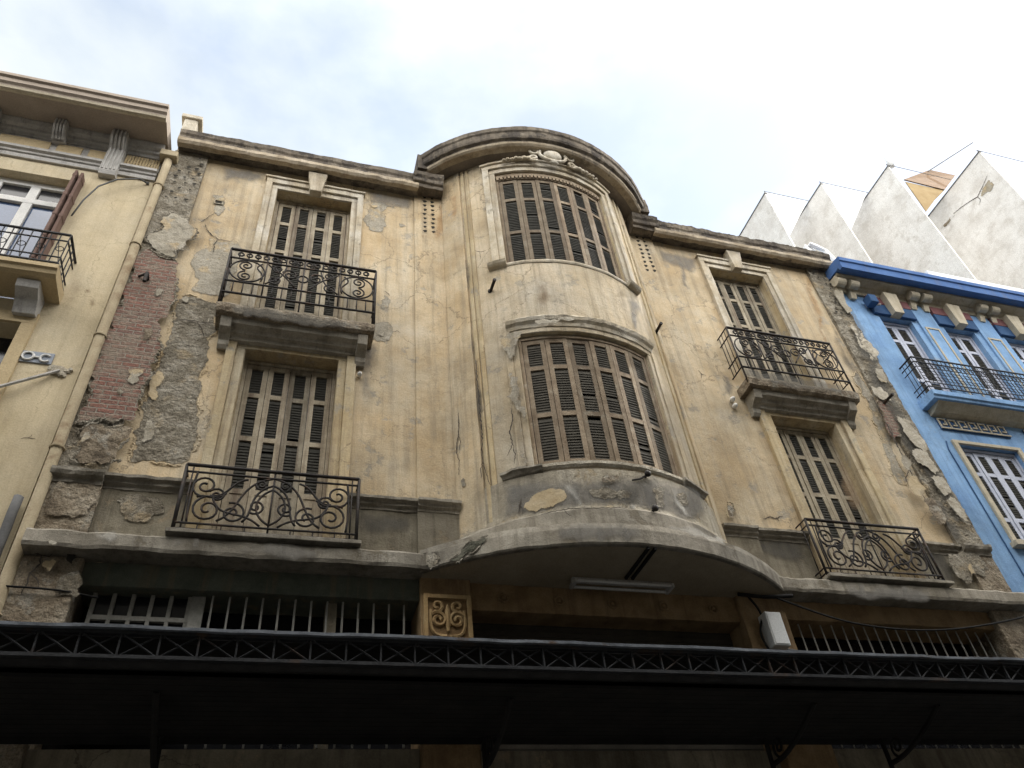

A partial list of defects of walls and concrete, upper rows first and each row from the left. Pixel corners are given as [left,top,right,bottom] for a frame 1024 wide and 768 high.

hole [213,195,225,216]
flaking render [69,211,244,468]
crack [456,363,490,484]
crack [508,409,516,463]
spalling [834,290,968,524]
spalling [45,481,97,518]
spalling [117,493,165,523]
peeling [524,488,567,512]
spalling [42,554,83,597]
spalling [423,535,488,570]
spalling [948,551,986,584]